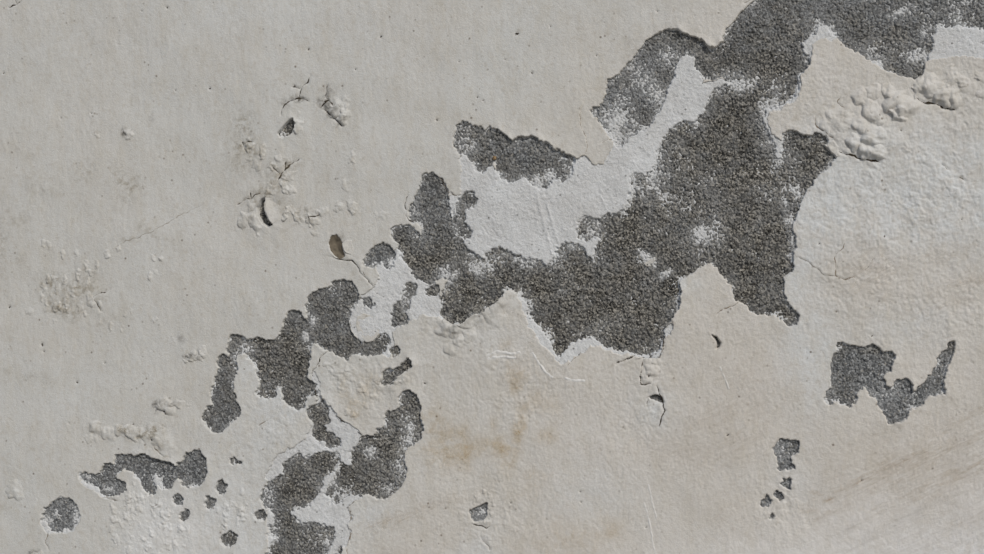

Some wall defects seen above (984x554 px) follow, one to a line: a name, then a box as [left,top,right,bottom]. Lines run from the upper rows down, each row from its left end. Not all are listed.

peeling [202,0,984,554]
peeling [40,496,81,534]
peeling [79,450,208,521]